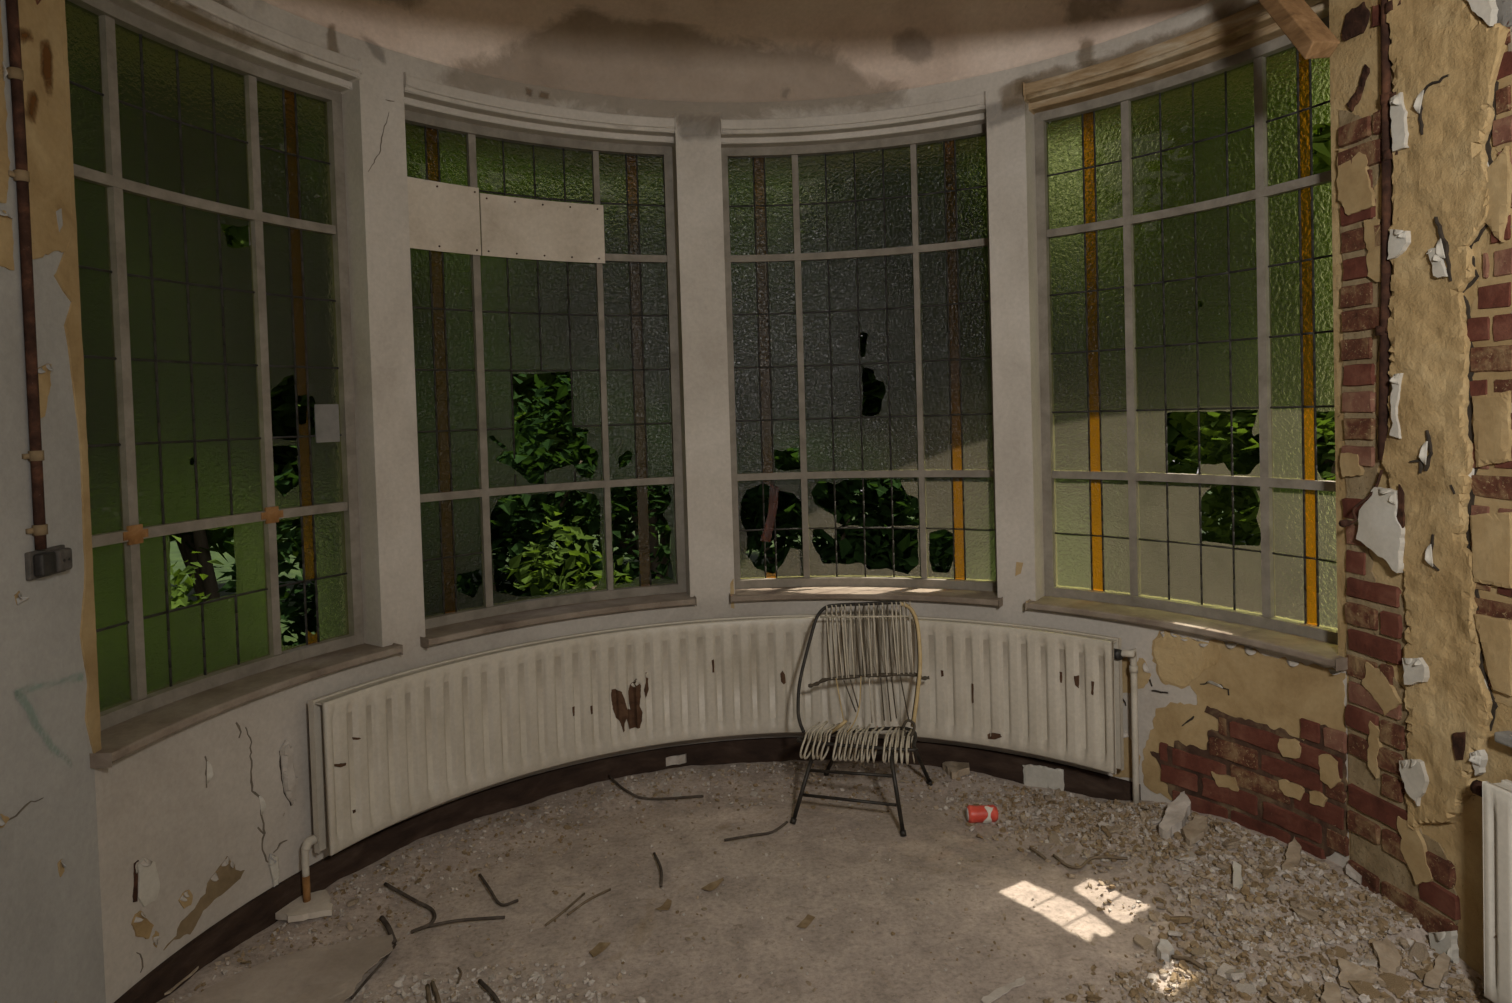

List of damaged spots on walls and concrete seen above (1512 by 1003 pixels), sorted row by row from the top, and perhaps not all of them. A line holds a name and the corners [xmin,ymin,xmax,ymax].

flaking render [1467,0,1512,164]
peeling [0,0,102,753]
flaking render [1467,194,1512,515]
flaking render [1113,92,1461,964]
flaking render [1474,582,1512,620]
corrosion [611,679,643,733]
flaking render [1452,732,1488,776]
crack [8,798,43,821]
peeling [131,856,245,950]